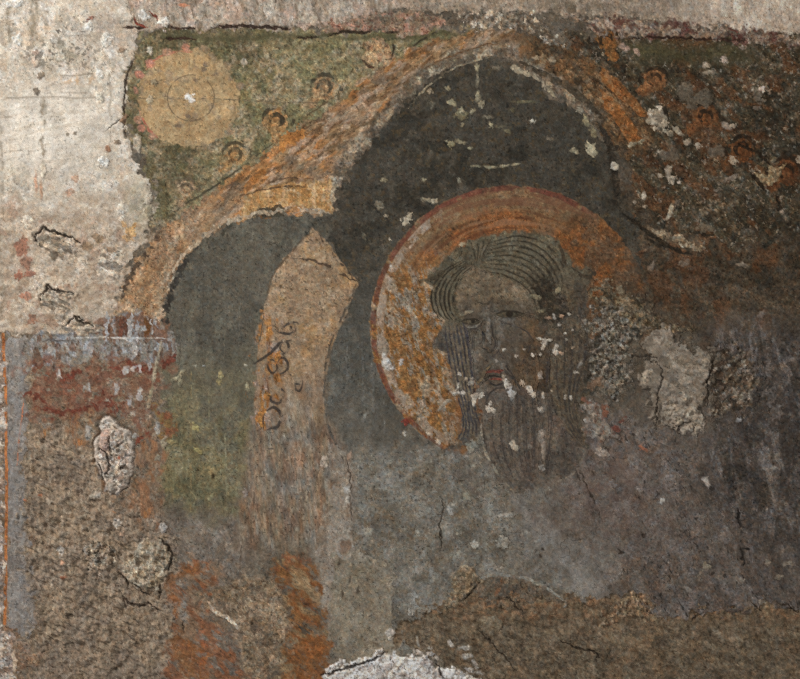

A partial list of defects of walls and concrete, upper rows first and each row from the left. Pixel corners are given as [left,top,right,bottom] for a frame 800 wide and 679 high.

flaking render [137,8,171,32]
crack [122,10,400,41]
peeling [701,55,728,76]
peeling [644,104,800,215]
crack [32,225,82,244]
flaking render [12,214,43,302]
crack [38,283,75,302]
crack [62,315,95,328]
flaking render [494,273,762,445]
peeling [435,371,496,415]
flaking render [10,414,297,679]
flaking render [325,544,800,679]